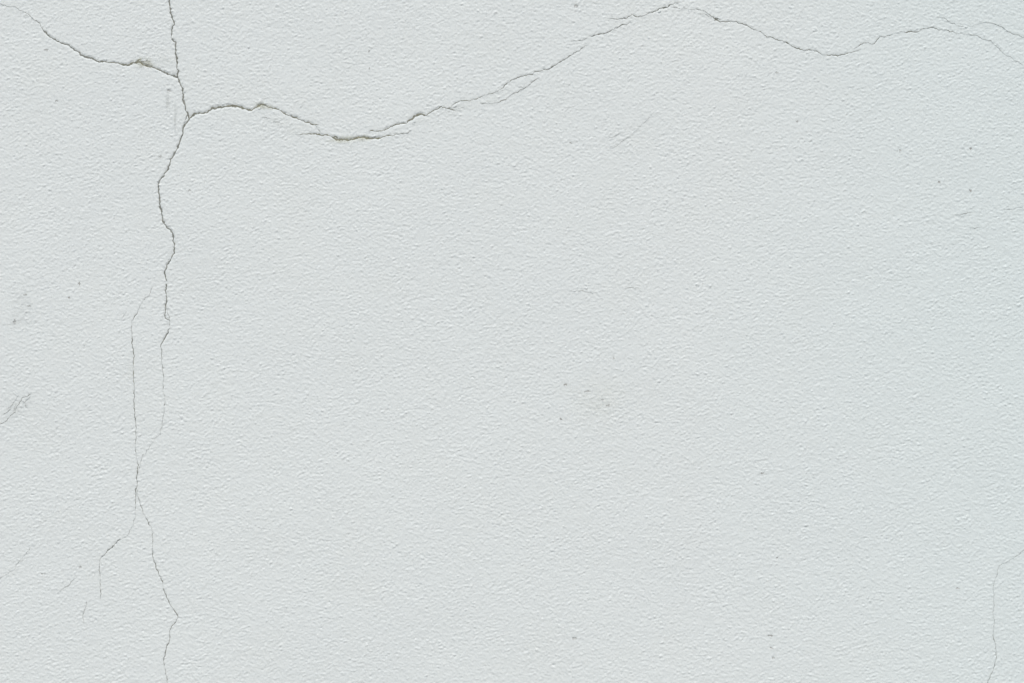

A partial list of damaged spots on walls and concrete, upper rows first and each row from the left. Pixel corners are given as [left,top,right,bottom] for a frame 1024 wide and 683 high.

crack [7,0,1022,442]
crack [99,314,178,680]